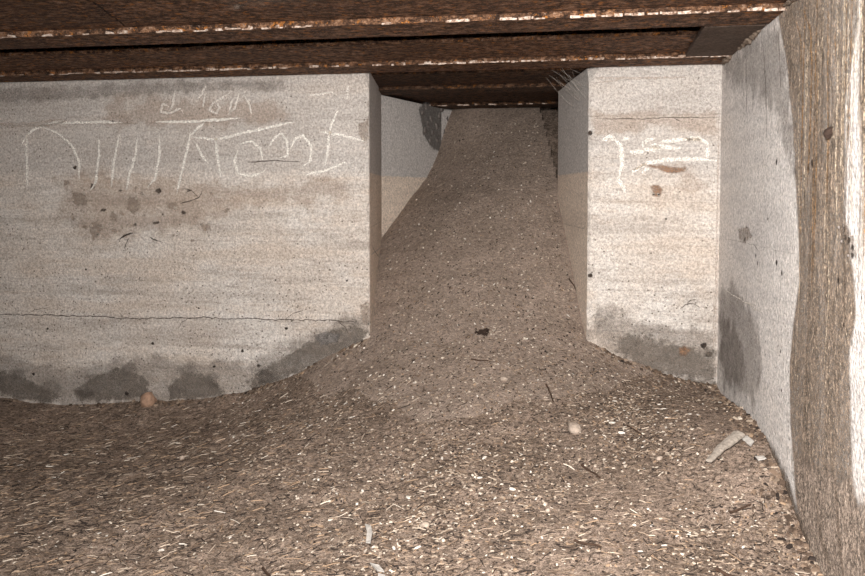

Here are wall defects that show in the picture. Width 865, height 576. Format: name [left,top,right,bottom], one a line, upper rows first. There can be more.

water stain [618,125,719,383]
water stain [73,368,147,401]
water stain [168,373,221,399]
water stain [247,326,367,388]